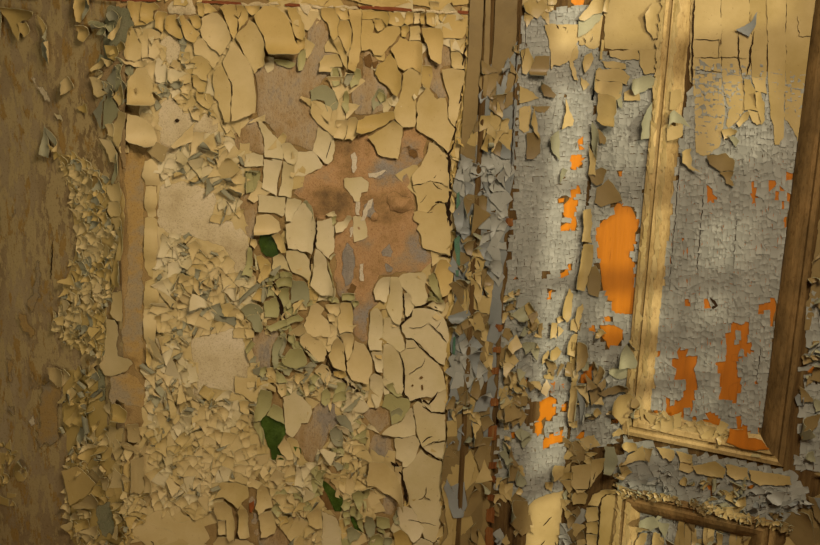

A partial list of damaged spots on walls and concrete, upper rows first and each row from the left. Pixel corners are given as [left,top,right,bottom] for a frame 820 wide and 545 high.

peeling [0,7,49,65]
peeling [521,0,665,178]
peeling [689,0,815,186]
flaking render [38,0,562,545]
crack [397,436,442,461]
crack [399,293,446,414]
peeling [550,288,584,339]
peeling [493,428,683,545]
peeling [556,0,769,451]
peeling [635,516,751,545]
peeling [656,447,820,545]
peeling [795,341,820,441]